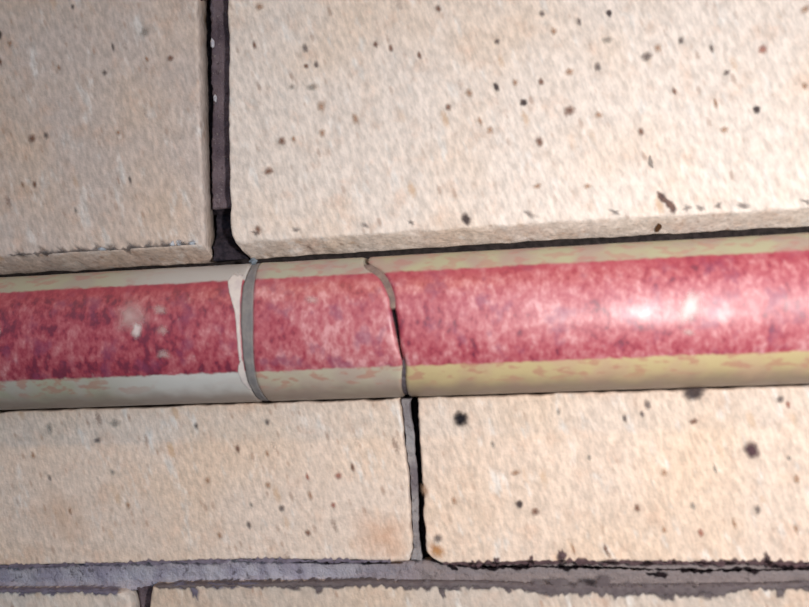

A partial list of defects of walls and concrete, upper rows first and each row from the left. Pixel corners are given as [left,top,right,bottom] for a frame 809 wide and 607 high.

peeling [228,273,251,390]
crack [364,263,427,552]
crack [298,558,403,566]